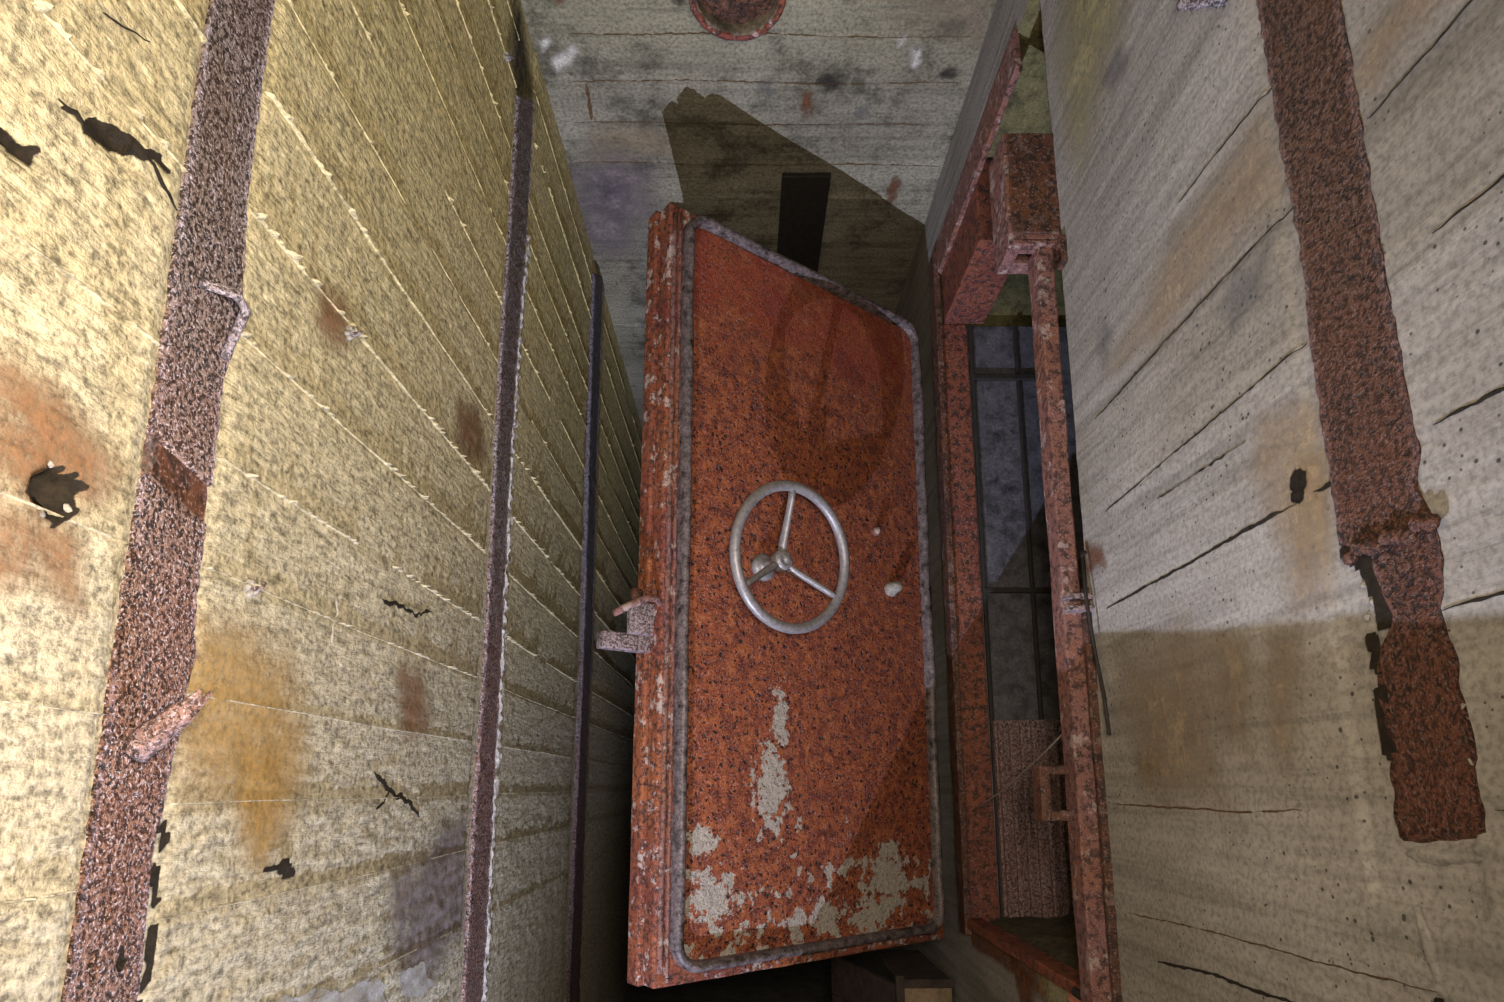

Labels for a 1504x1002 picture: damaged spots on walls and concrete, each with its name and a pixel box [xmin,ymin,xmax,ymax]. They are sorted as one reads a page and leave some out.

spalling [82,117,171,174]
crack [1432,174,1504,234]
crack [1433,387,1504,425]
spalling [25,460,89,528]
rust [1260,418,1320,546]
crack [1442,591,1504,611]